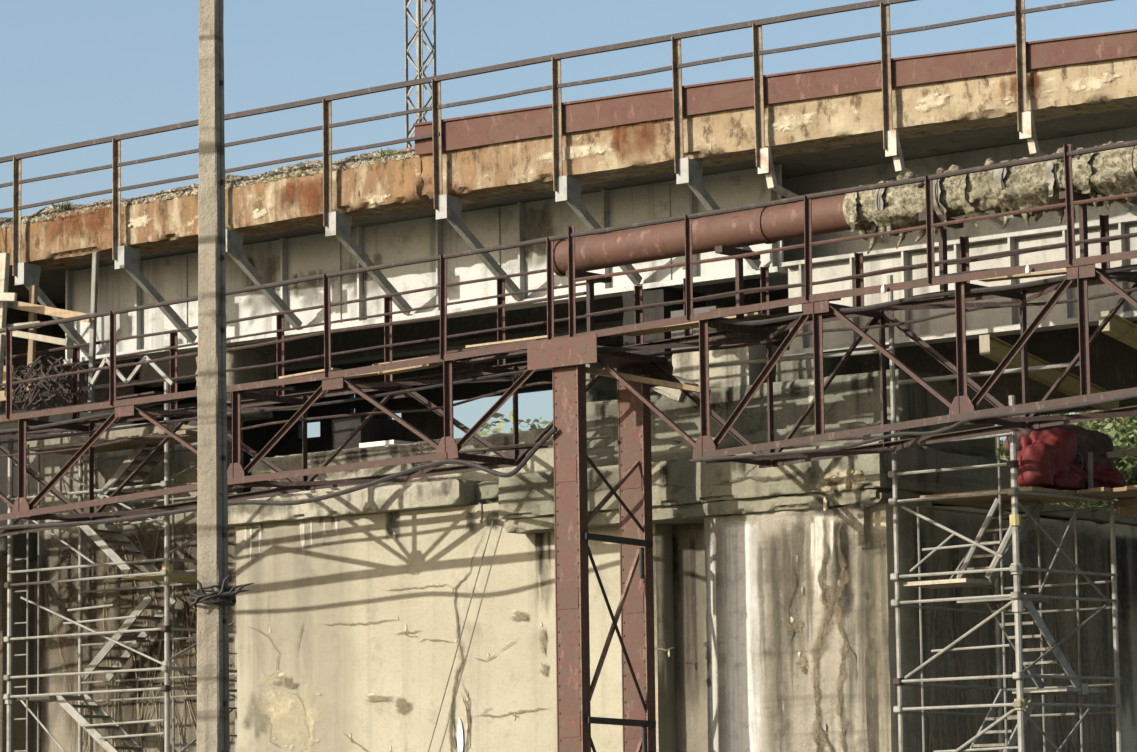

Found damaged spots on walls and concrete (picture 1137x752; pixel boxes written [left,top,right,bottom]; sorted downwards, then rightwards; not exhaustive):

crack [217,347,225,458]
spalling [806,468,876,512]
crack [218,525,226,603]
crack [250,541,545,752]
water stain [672,516,888,752]
water stain [905,514,1137,752]
peeling [265,673,322,751]